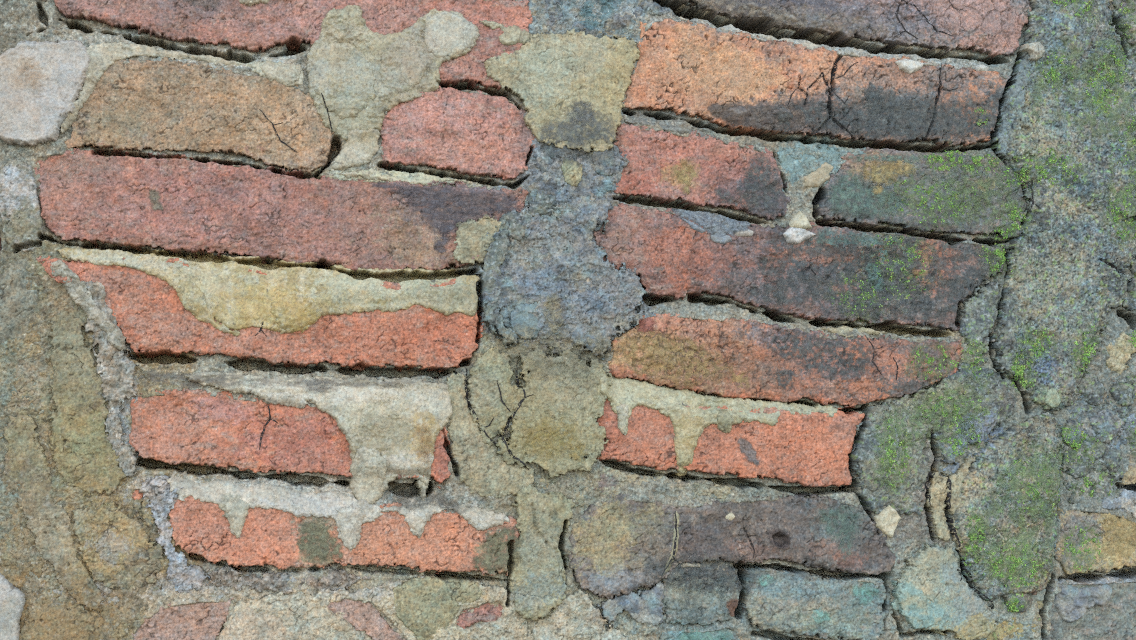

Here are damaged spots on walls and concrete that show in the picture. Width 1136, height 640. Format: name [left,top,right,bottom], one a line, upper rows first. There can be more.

crack [788,56,858,138]
crack [920,63,959,141]
crack [465,365,534,470]
crack [923,433,993,602]